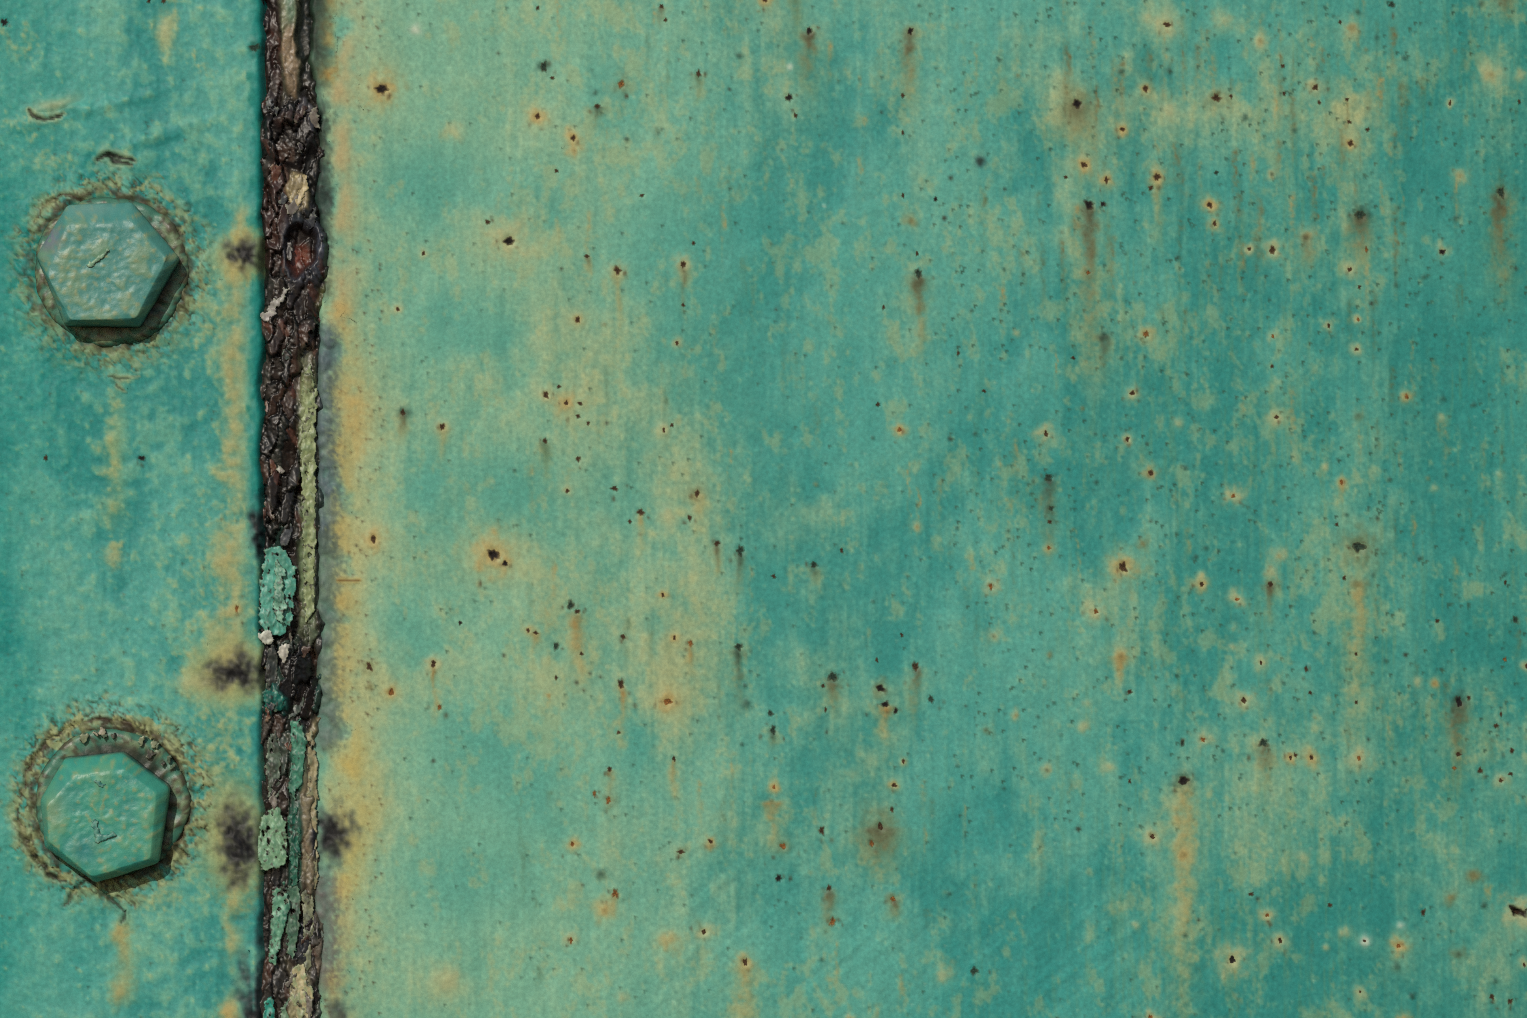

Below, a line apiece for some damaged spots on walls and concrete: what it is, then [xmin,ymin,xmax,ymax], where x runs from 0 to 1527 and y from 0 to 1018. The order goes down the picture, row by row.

rust [1117,2,1187,103]
peeling [0,154,223,386]
rust [904,266,934,354]
rust [1050,78,1159,404]
rust [1142,161,1176,243]
rust [1447,164,1520,303]
rust [454,517,528,590]
rust [1082,535,1154,629]
rust [1108,642,1134,687]
rust [1426,674,1479,799]
rust [1136,722,1295,1018]
rust [1440,864,1527,973]